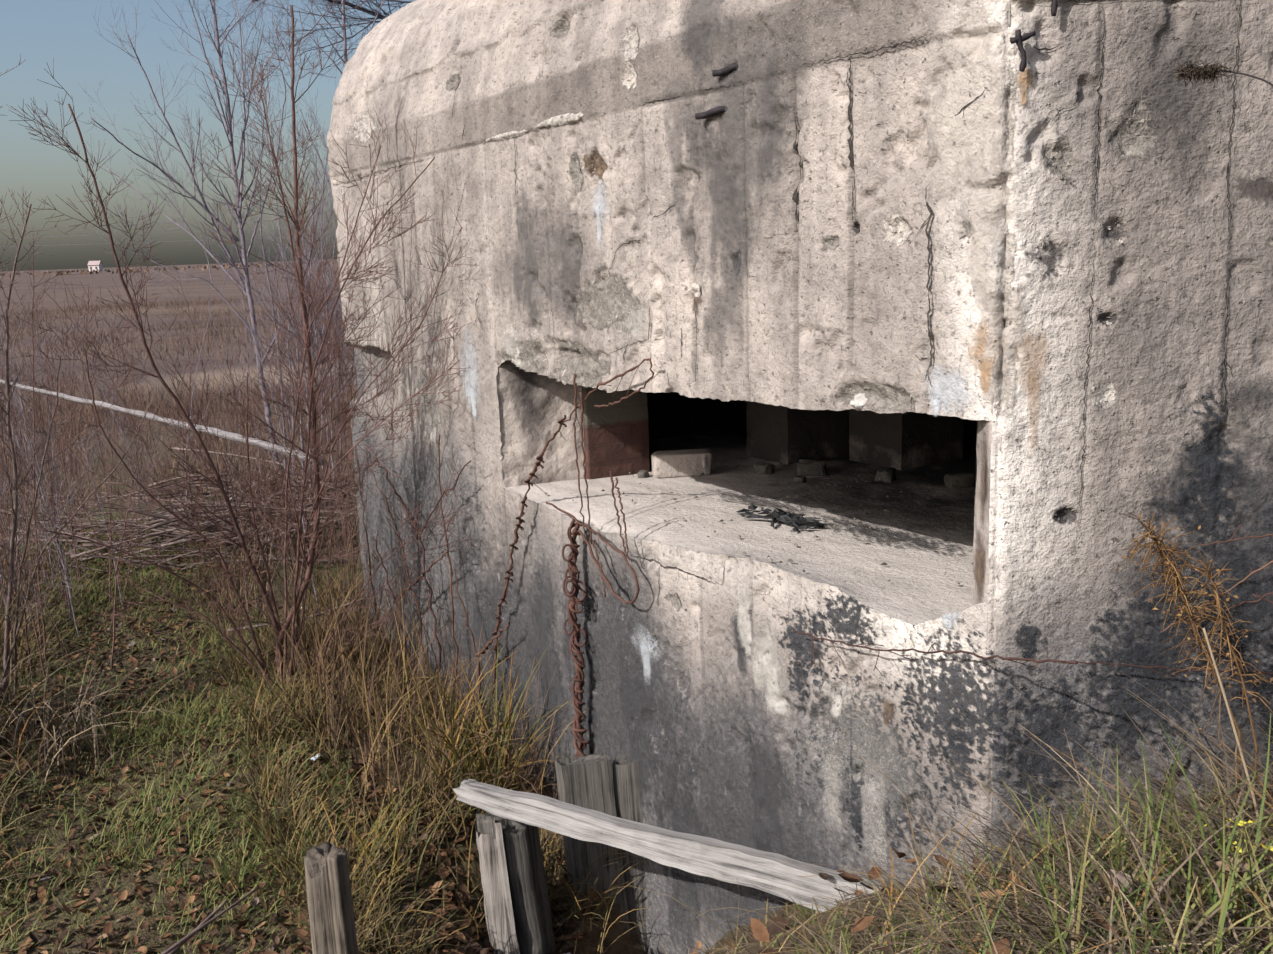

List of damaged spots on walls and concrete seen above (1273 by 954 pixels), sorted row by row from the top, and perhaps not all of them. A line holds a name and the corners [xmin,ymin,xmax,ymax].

spalling [569,147,607,192]
crack [807,34,931,234]
crack [914,184,934,387]
crack [1028,0,1120,531]
crack [1223,0,1241,443]
damp [832,695,843,717]
damp [1101,439,1257,775]